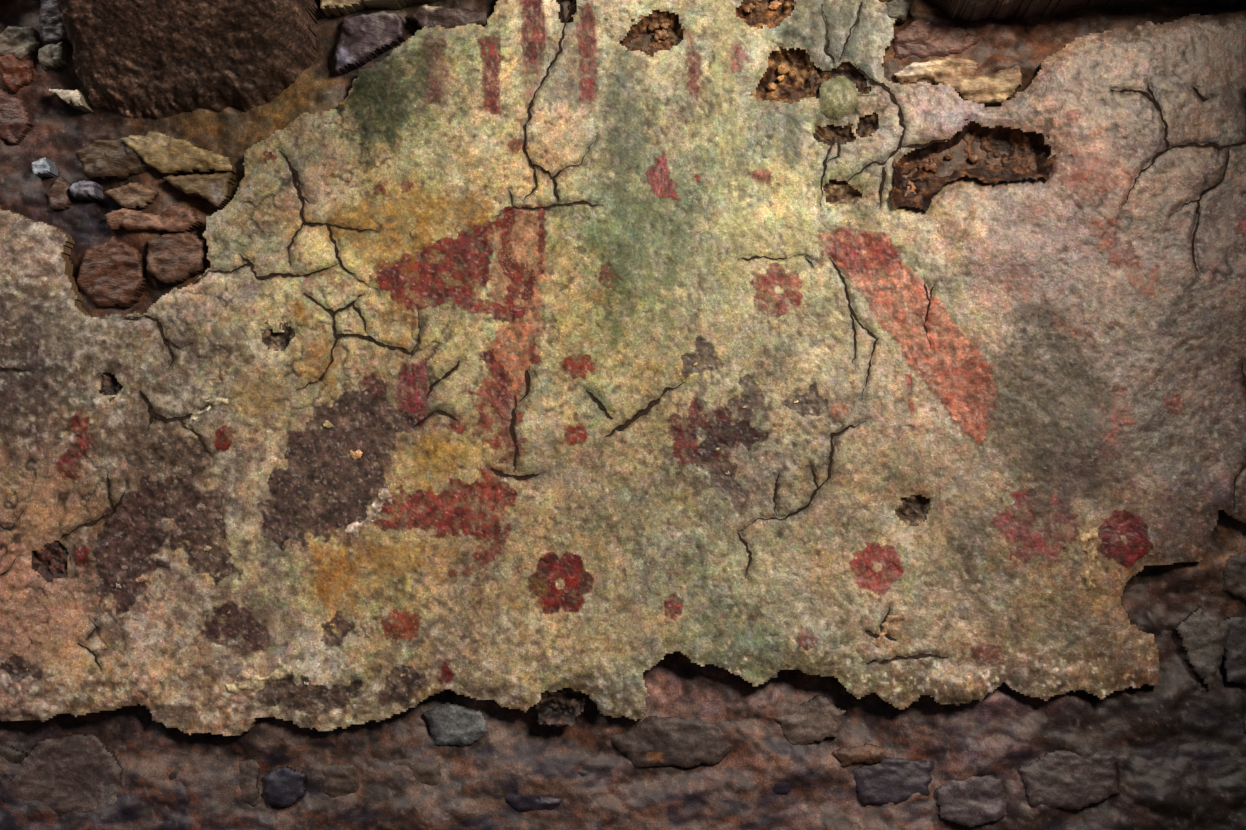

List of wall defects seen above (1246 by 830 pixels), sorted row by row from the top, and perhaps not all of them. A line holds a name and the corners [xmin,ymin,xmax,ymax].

spalling [620,10,685,57]
spalling [732,0,796,29]
spalling [750,43,871,104]
crack [495,0,604,217]
spalling [813,113,878,145]
spalling [823,180,862,206]
spalling [891,119,1056,211]
crack [1111,85,1246,275]
crack [193,150,421,390]
crack [415,360,460,427]
crack [738,253,878,578]
spalling [535,686,585,727]